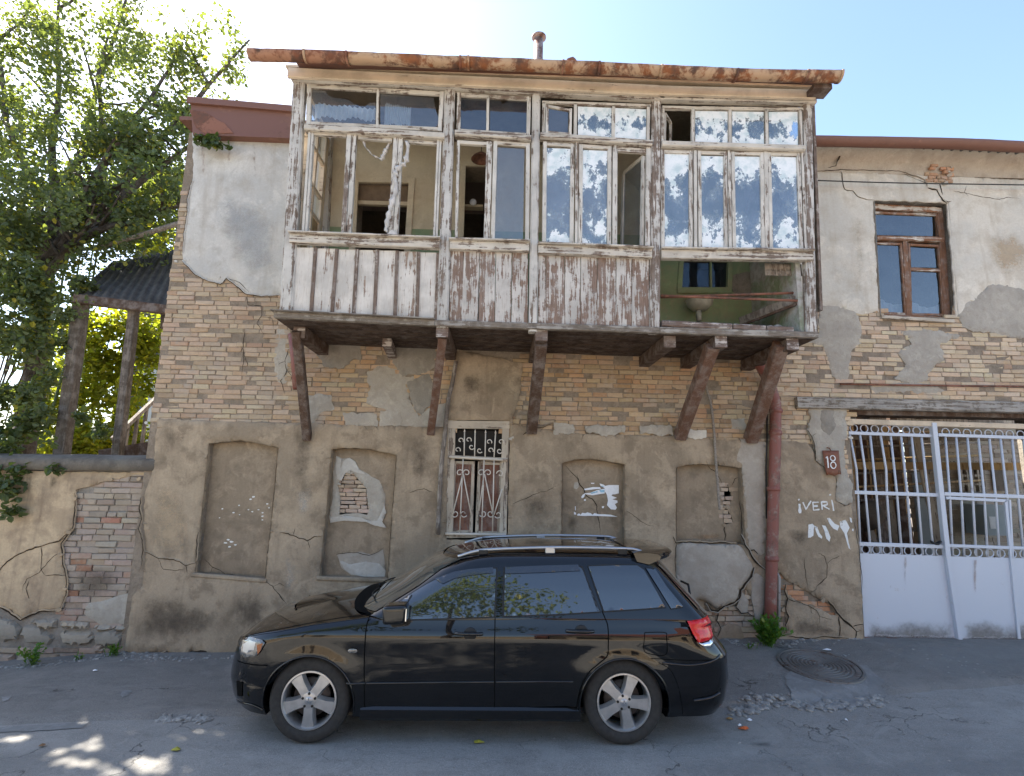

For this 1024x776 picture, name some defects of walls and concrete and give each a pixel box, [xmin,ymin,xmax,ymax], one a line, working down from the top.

crack [817,156,1019,203]
spalling [144,191,457,426]
spalling [498,353,697,440]
spalling [687,360,761,440]
spalling [759,298,1024,444]
crack [0,493,77,621]
spalling [55,471,143,628]
crack [138,497,233,575]
flaking render [329,456,386,528]
crack [515,466,601,534]
crack [673,466,766,637]
crack [784,523,863,639]